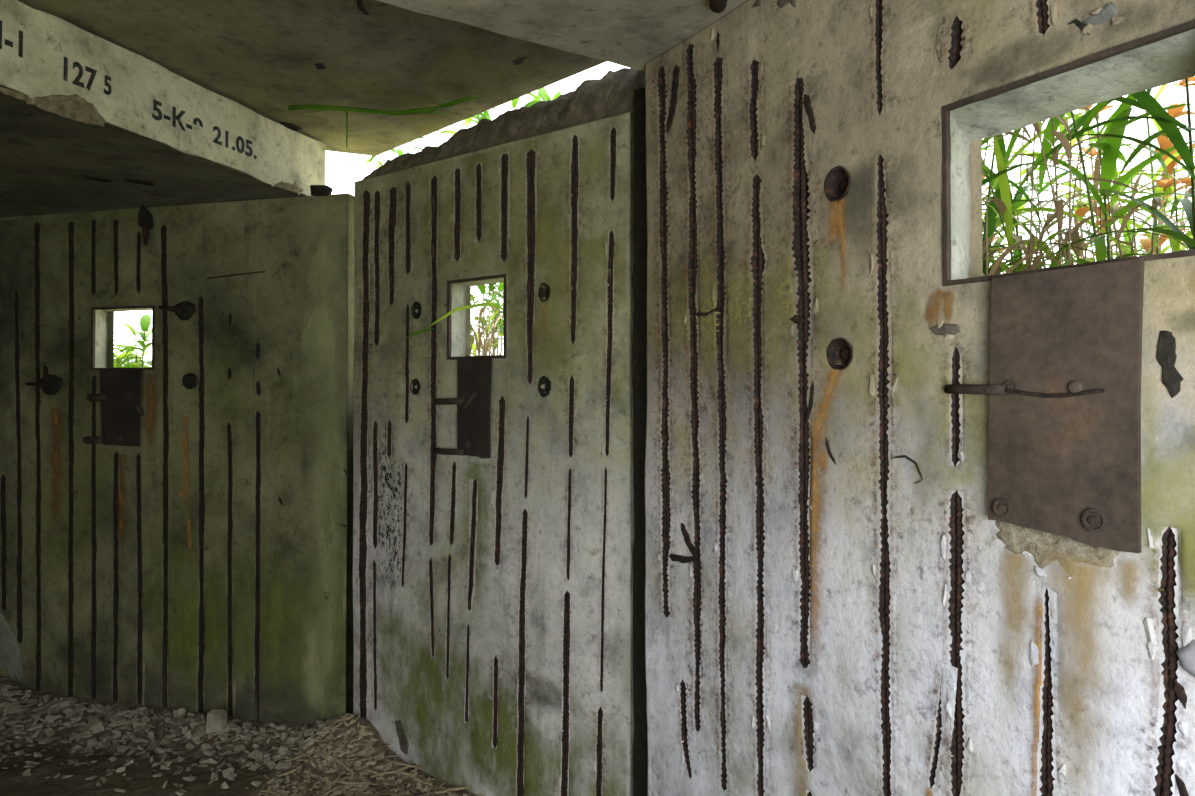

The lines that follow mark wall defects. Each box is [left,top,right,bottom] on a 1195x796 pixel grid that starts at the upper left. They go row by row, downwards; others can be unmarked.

spalling [0,87,107,127]
spalling [1156,330,1183,398]
rust [810,369,839,629]